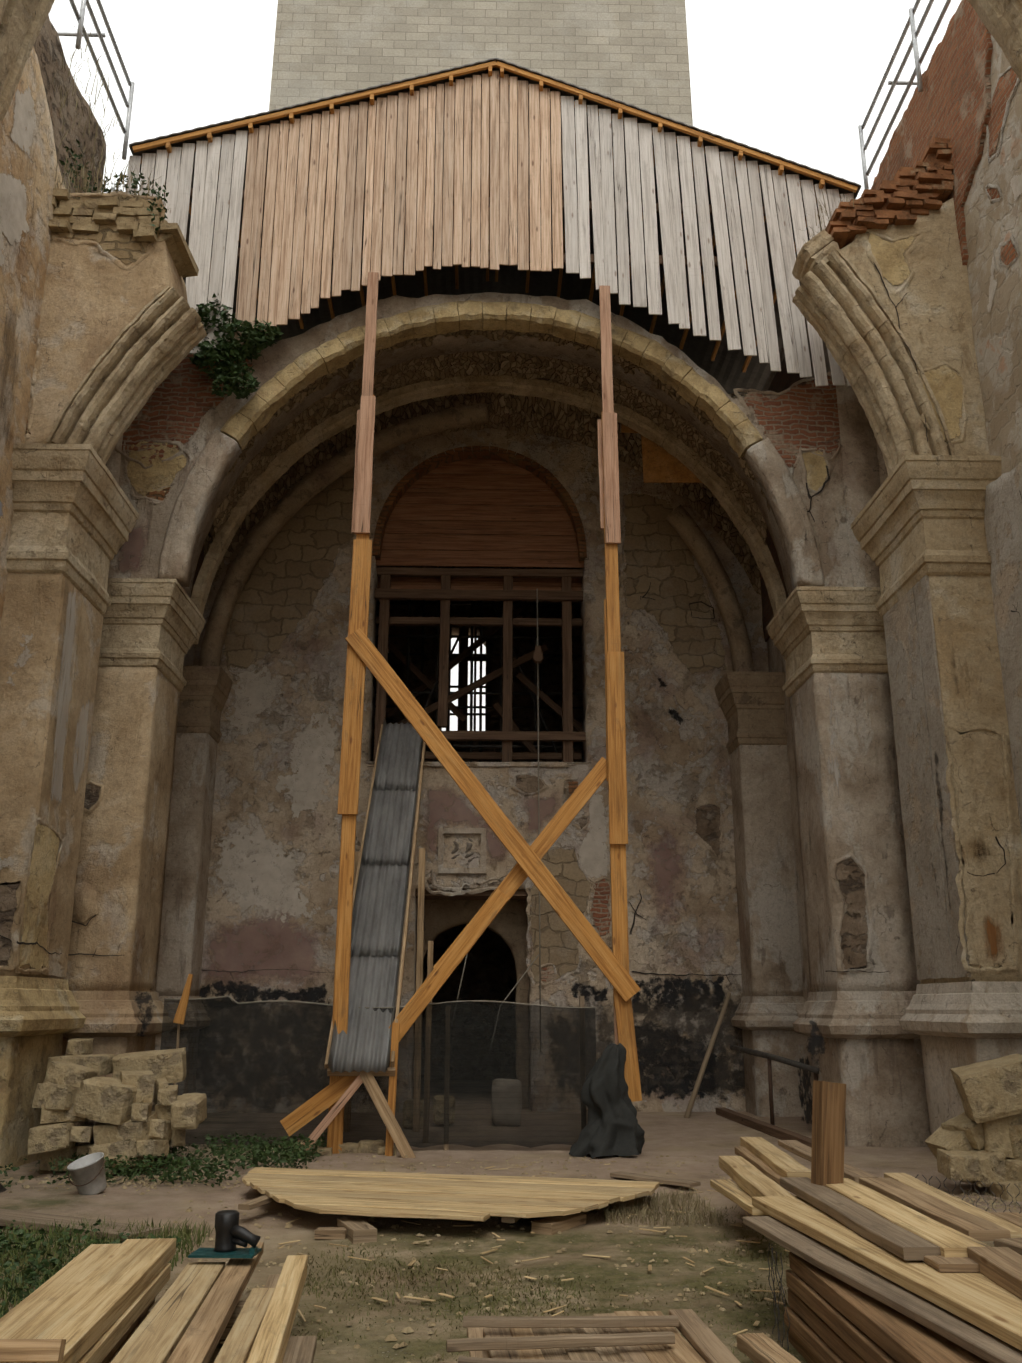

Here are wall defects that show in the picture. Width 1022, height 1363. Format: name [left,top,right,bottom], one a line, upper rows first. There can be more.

flaking render [115,353,257,505]
flaking render [733,371,849,499]
flaking render [0,817,63,973]
spalling [830,853,874,974]